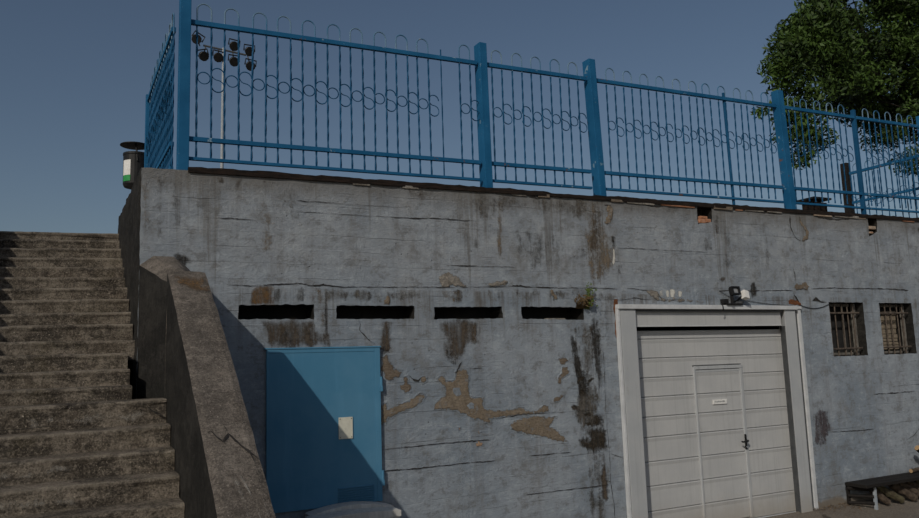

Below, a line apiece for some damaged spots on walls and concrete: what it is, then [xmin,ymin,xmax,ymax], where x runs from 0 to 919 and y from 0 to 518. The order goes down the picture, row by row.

spalling [604,199,782,224]
damp [263,290,370,348]
damp [443,320,477,359]
peeling [380,353,570,448]
damp [571,319,608,518]
crack [205,426,263,480]